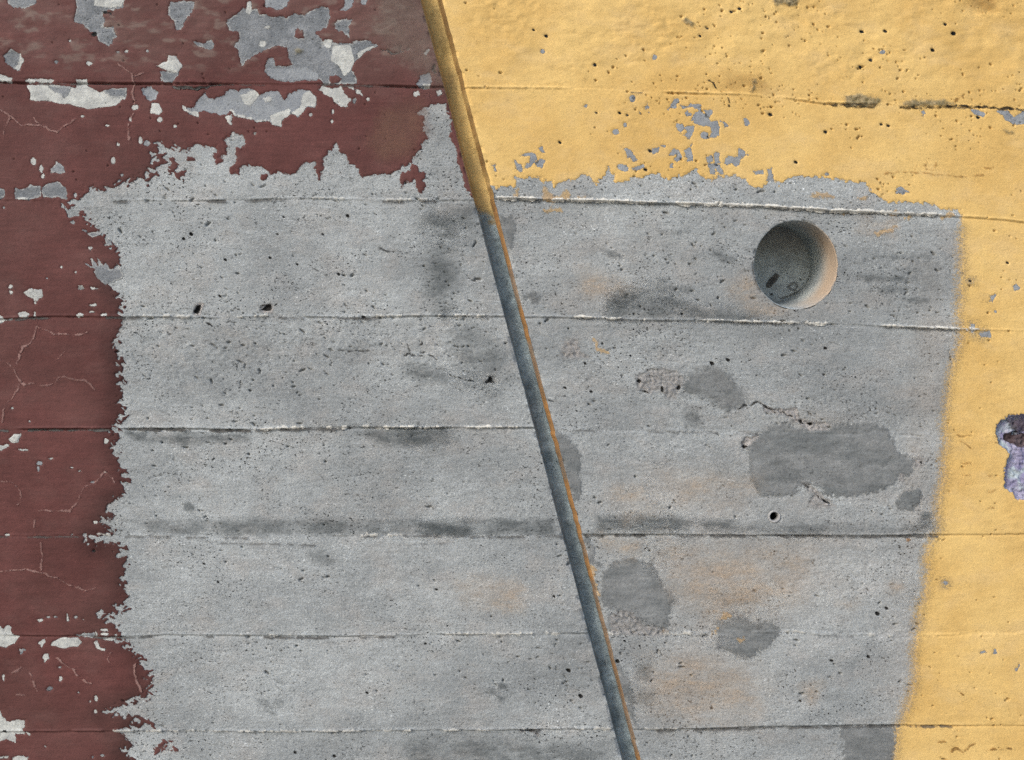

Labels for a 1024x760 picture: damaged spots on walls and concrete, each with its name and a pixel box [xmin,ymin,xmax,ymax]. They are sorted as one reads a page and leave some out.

peeling [0,49,182,122]
peeling [182,0,378,136]
corrosion [490,194,513,274]
corrosion [518,302,532,347]
crack [1,327,87,423]
crack [45,471,115,512]
corrosion [537,378,563,463]
crack [738,401,811,425]
spalling [995,414,1024,500]
crack [0,569,93,591]
corrosion [563,476,603,617]
peeling [0,712,30,743]